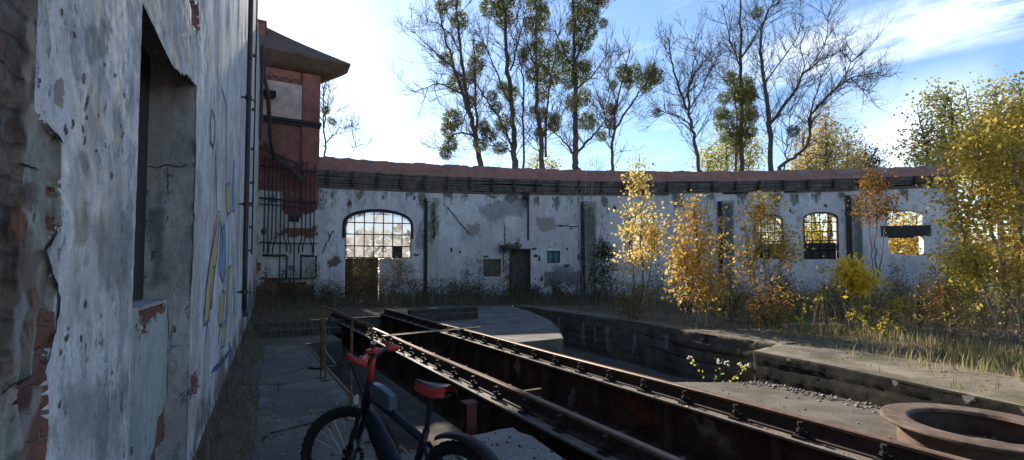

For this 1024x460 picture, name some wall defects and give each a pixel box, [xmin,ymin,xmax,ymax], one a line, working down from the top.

spalling [189,0,200,36]
spalling [0,0,106,460]
crack [149,82,197,300]
peeling [256,190,342,286]
crack [431,204,470,242]
spalling [135,300,166,340]